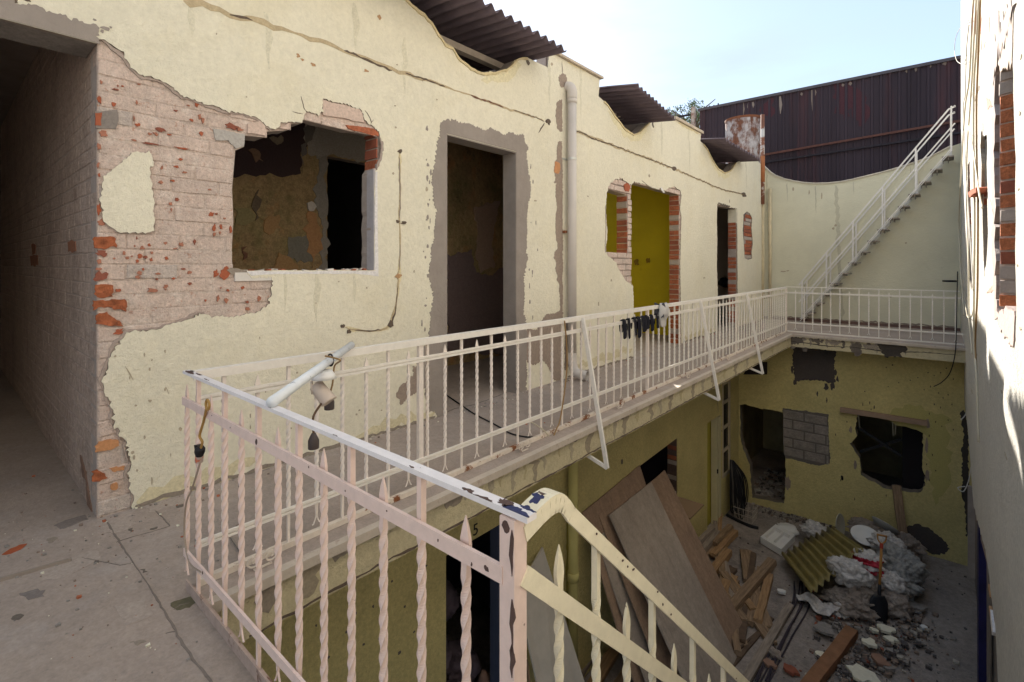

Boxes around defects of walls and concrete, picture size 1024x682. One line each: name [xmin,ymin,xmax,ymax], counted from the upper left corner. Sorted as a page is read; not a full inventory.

crack [344,50,445,87]
crack [471,95,543,121]
crack [577,131,741,194]
flaking render [968,0,1016,348]
spalling [91,39,384,518]
spalling [605,178,681,343]
spalling [743,212,752,260]